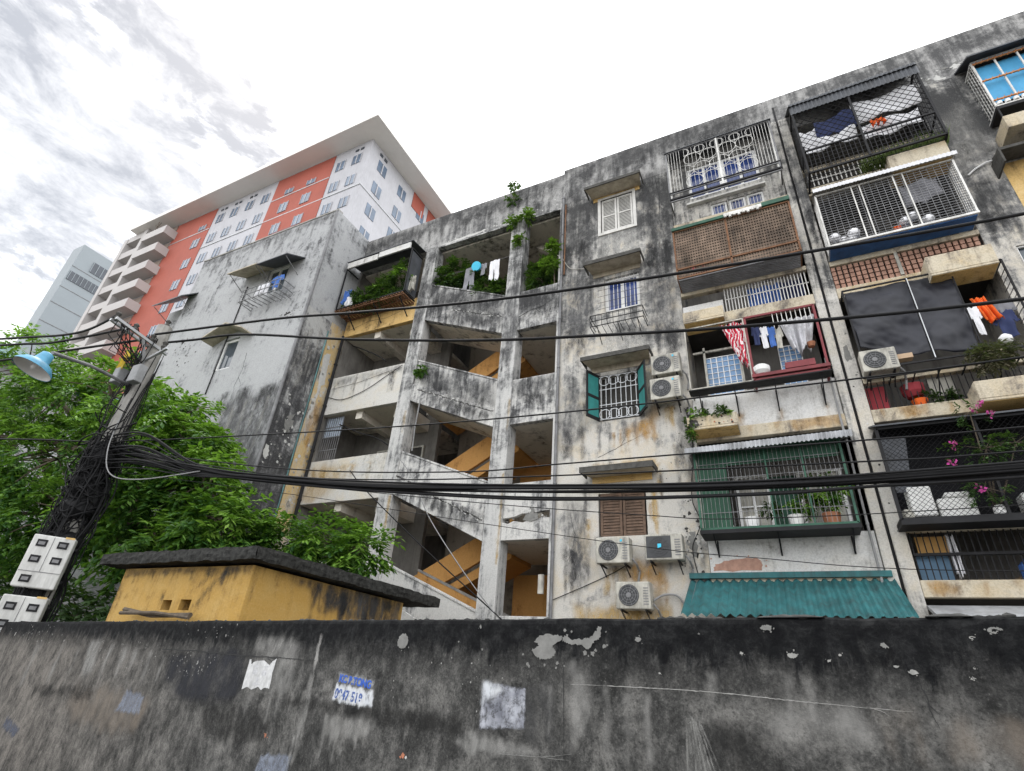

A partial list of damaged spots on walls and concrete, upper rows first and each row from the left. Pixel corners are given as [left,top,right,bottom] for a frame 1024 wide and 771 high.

water stain [425,370,490,416]
water stain [211,387,279,511]
peeling [681,499,768,573]
water stain [301,581,400,620]
peeling [397,633,409,653]
peeling [522,626,608,669]
water stain [166,650,267,739]